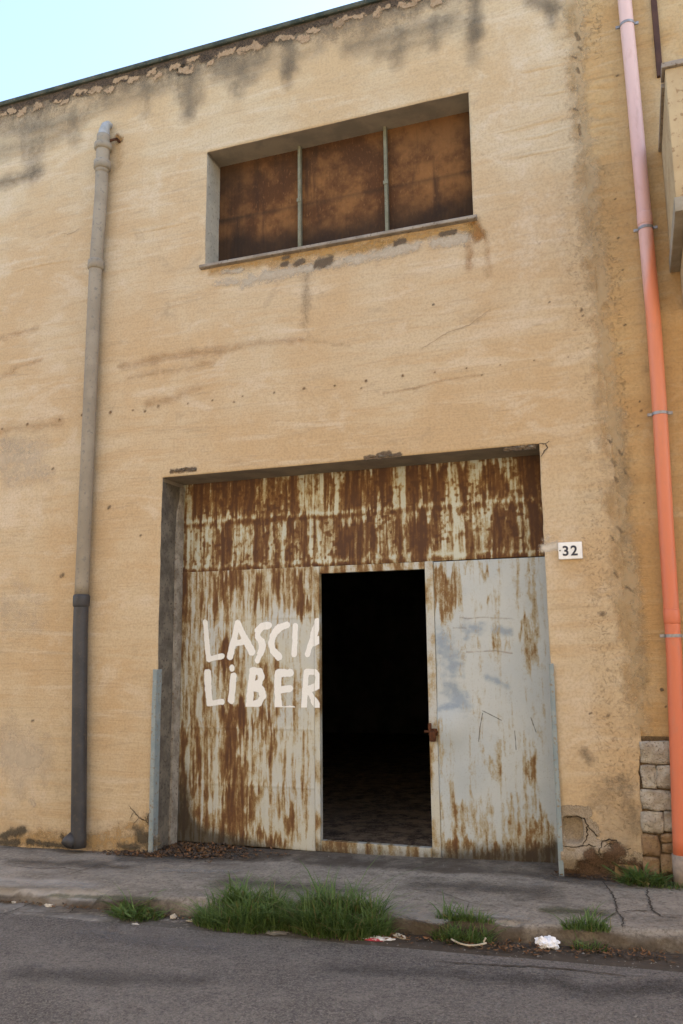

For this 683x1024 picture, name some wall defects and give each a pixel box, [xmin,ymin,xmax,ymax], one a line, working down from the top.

spalling [0,0,444,118]
peeling [214,229,468,289]
spalling [561,805,643,878]